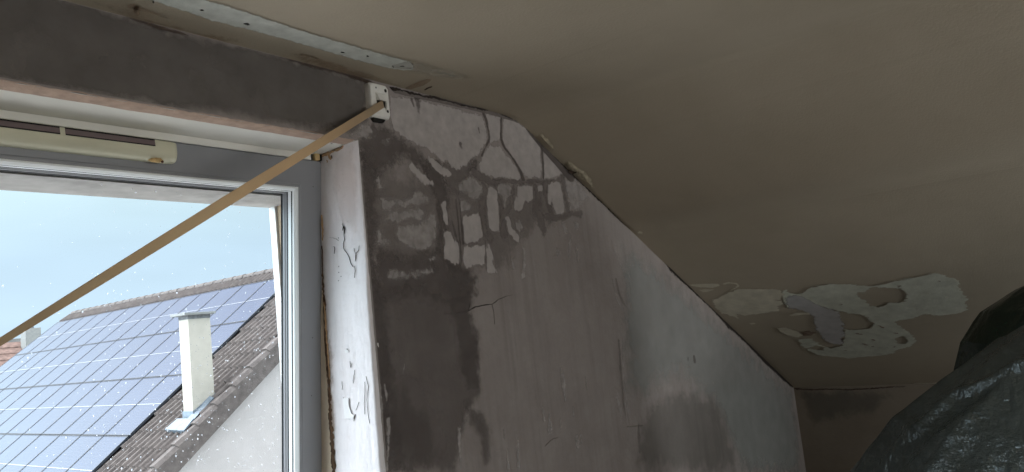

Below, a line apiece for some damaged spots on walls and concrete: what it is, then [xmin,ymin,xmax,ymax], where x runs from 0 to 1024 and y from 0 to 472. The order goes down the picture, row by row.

crack [390,86,618,218]
leakage [0,0,588,471]
crack [321,215,370,472]
crack [668,266,906,390]
flaking render [691,273,968,359]